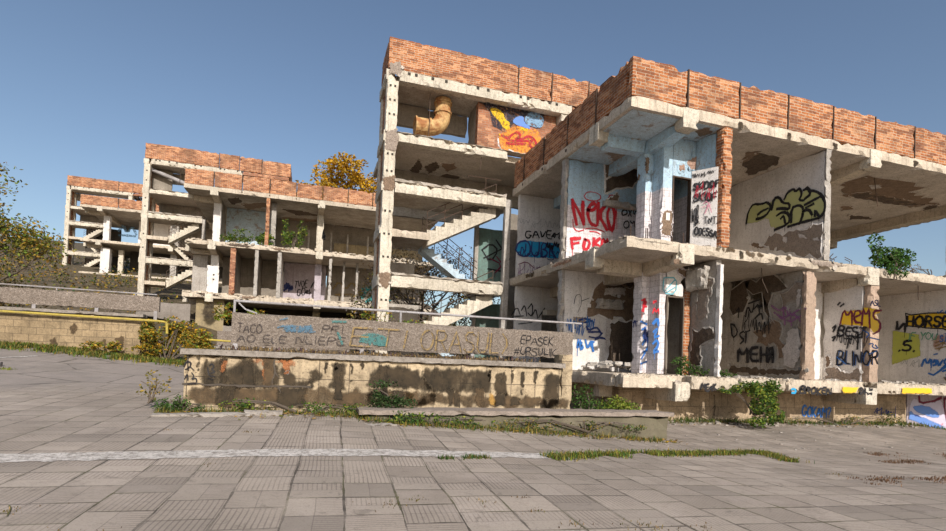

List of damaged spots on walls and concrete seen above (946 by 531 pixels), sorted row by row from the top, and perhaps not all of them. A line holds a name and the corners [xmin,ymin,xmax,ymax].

peeling [695,128,713,137]
spalling [604,152,651,201]
spalling [740,151,782,176]
spalling [838,174,942,220]
flaking render [748,222,847,271]
flaking render [571,278,635,365]
flaking render [688,276,715,368]
flaking render [726,274,809,378]
water stain [186,349,569,410]
flaking render [823,354,863,382]